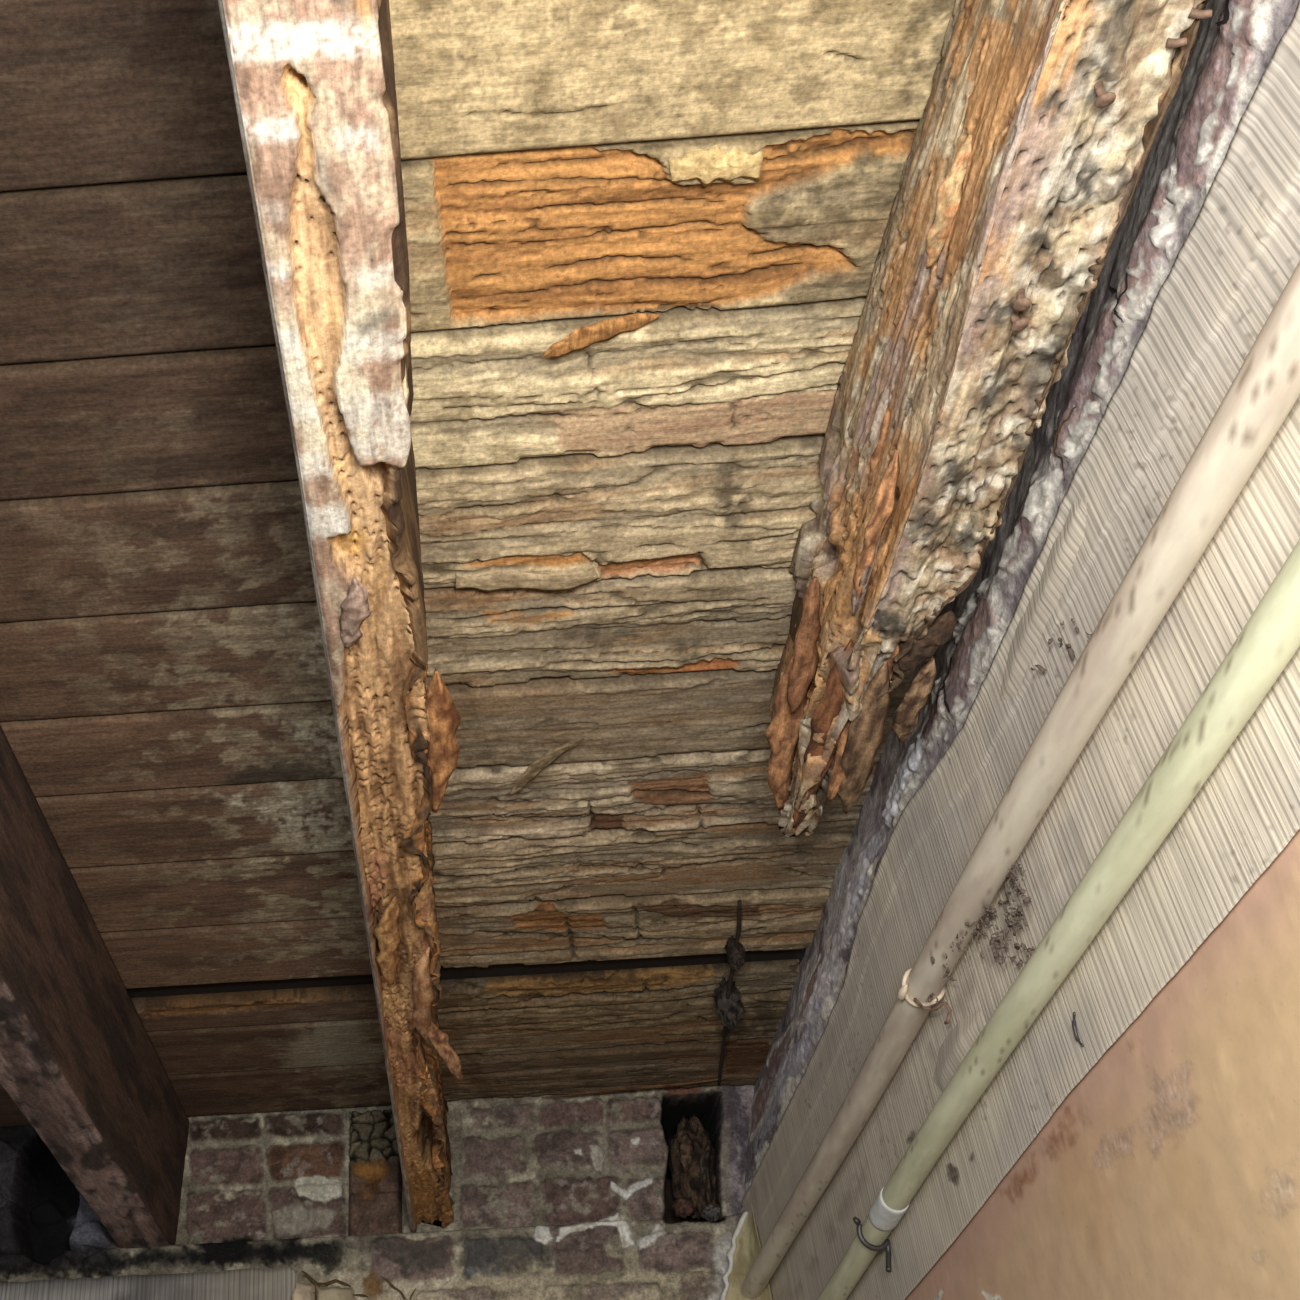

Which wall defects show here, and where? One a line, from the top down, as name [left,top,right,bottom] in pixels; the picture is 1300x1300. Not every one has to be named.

spalling [1194,7,1245,165]
peeling [669,144,764,187]
spalling [994,186,1183,588]
peeling [339,577,371,648]
spalling [944,626,998,742]
peeling [291,1280,357,1300]